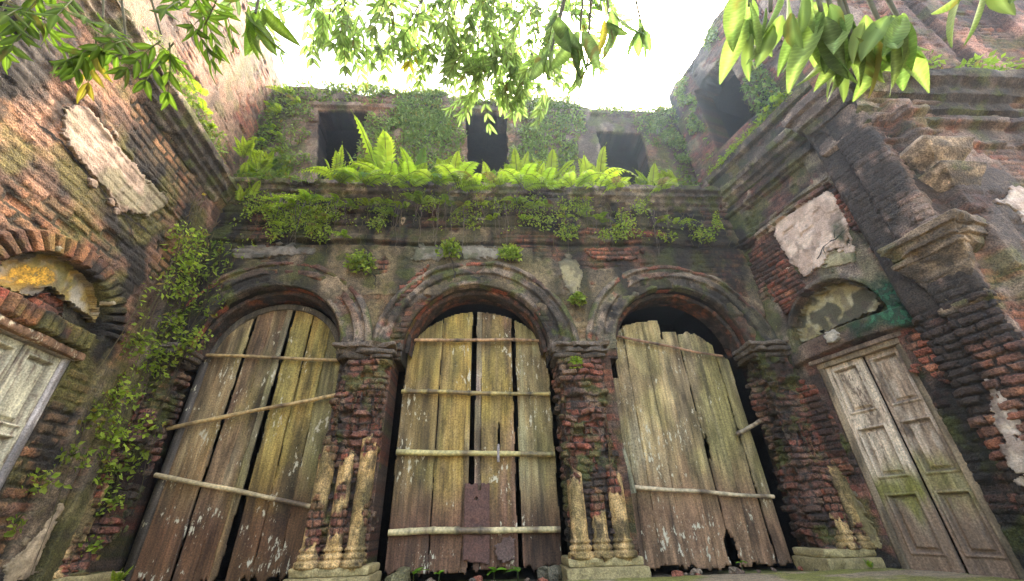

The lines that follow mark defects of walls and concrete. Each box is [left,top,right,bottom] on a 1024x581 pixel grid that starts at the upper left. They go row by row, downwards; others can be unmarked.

flaking render [59,105,169,217]
flaking render [991,185,1024,223]
flaking render [0,246,116,323]
flaking render [747,185,885,346]
spalling [796,379,855,475]
flaking render [984,379,1024,487]